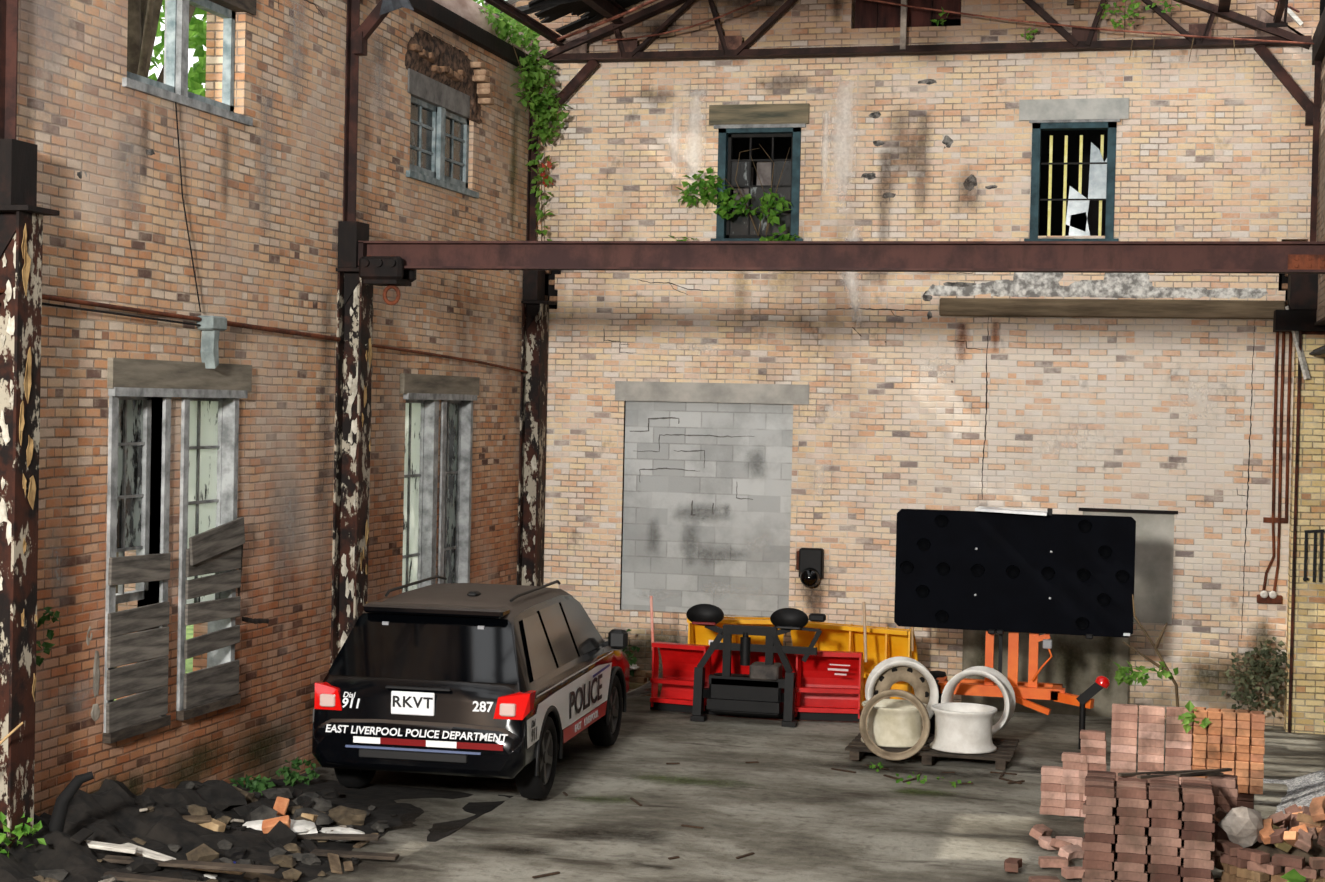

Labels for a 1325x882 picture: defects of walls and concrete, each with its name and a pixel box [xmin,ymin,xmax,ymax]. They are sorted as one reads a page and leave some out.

peeling [1,223,31,346]
peeling [350,287,359,321]
spalling [922,272,1268,319]
peeling [0,477,27,552]
peeling [0,348,36,509]
peeling [346,338,372,461]
crack [630,417,755,516]
peeling [341,521,369,648]